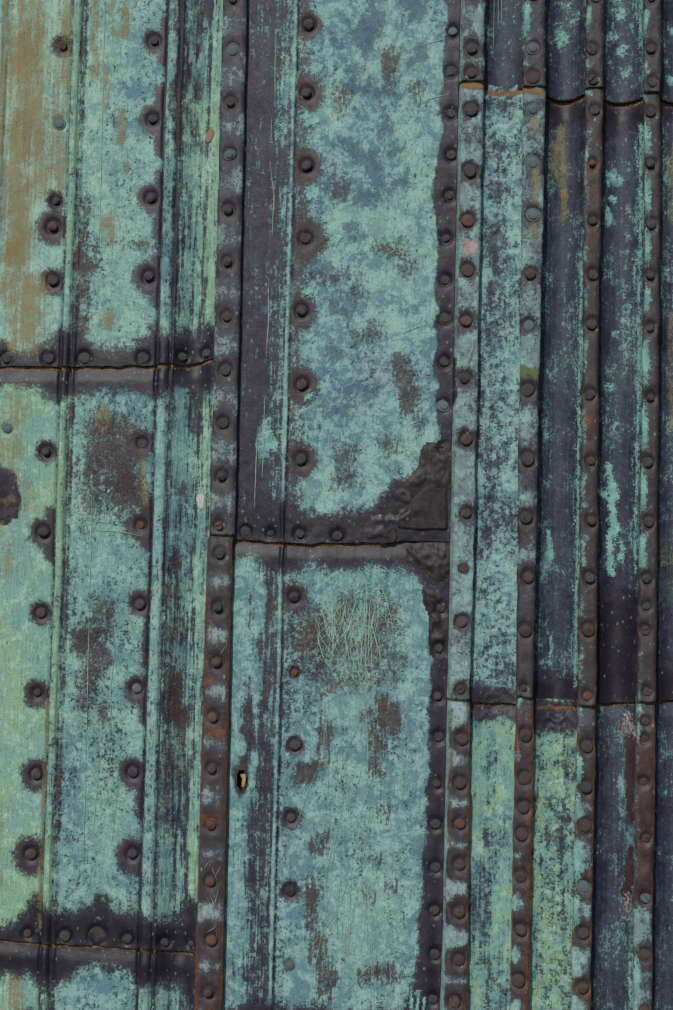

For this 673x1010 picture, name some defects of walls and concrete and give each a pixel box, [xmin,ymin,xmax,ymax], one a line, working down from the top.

rust [514,705,574,1010]